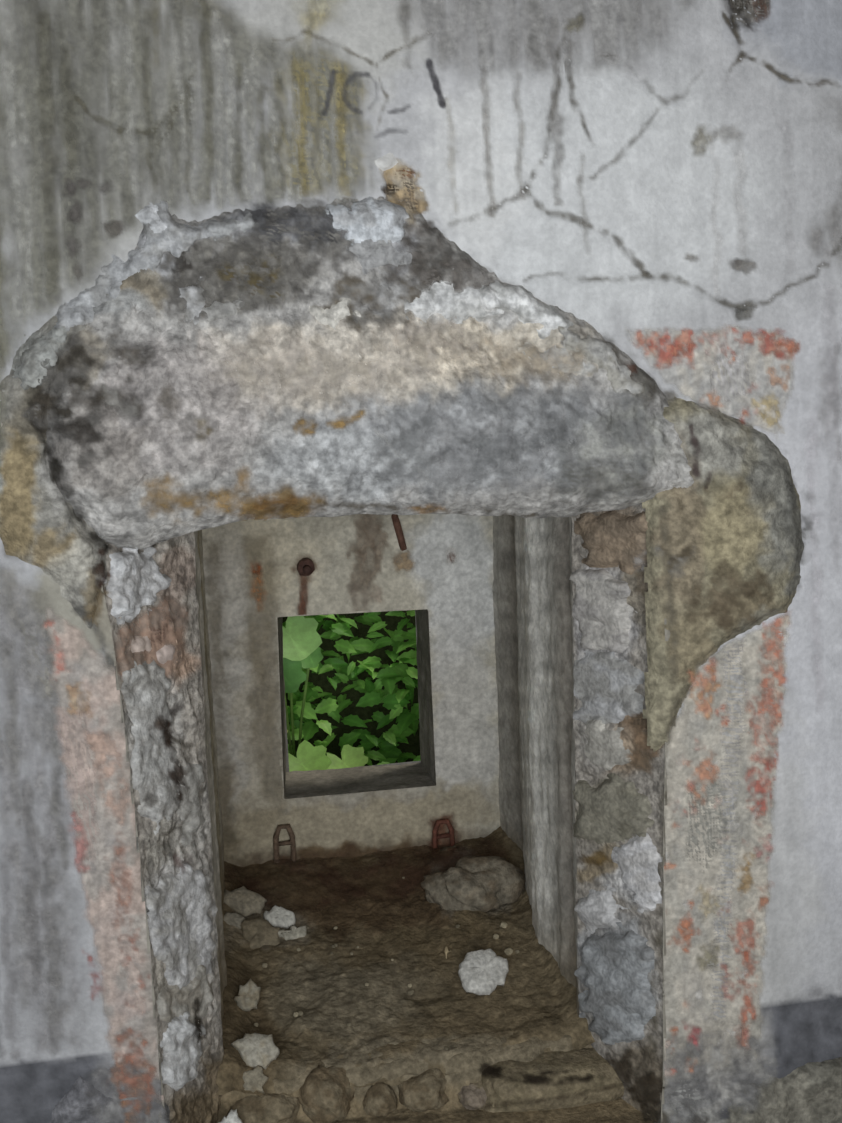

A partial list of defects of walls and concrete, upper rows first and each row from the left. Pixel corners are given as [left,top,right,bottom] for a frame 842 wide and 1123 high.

damp [509,0,557,61]
damp [572,0,637,65]
crack [723,13,794,82]
crack [551,53,589,135]
damp [0,0,494,364]
crack [547,212,667,279]
crack [720,301,753,309]
damp [23,333,141,465]
peeling [629,309,796,433]
rust [298,563,315,615]
rust [394,553,413,570]
peeling [569,510,790,1123]